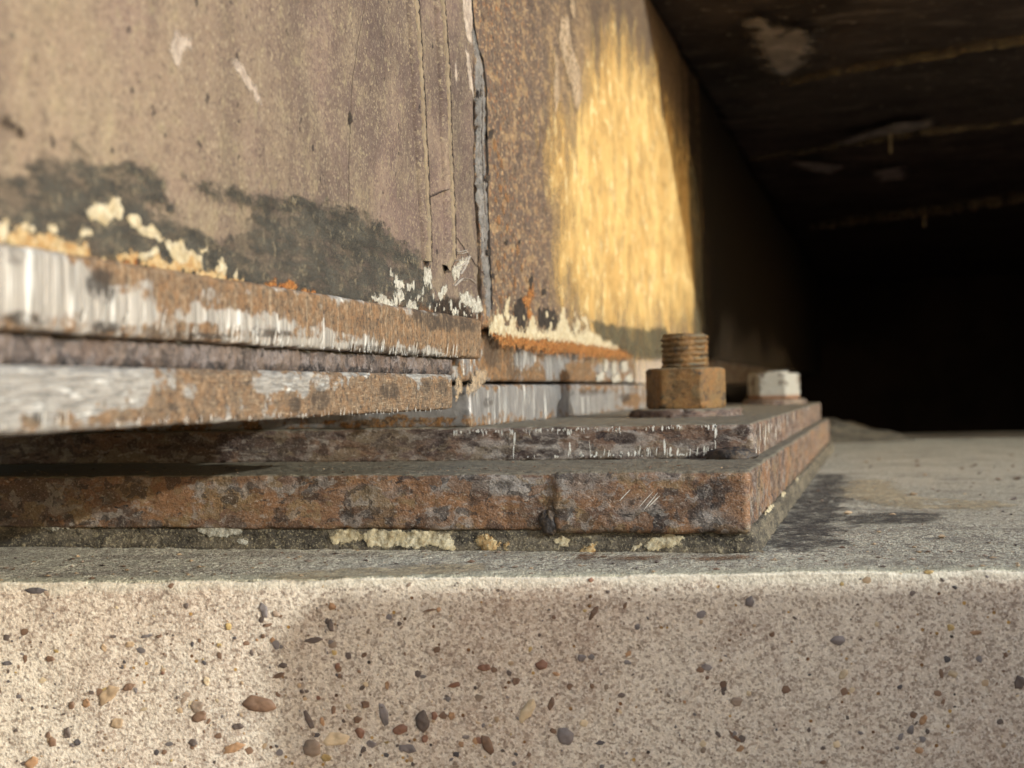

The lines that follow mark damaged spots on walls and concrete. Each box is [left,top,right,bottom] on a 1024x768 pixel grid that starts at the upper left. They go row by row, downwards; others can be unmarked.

water stain [0,22,704,384]
crack [457,0,495,319]
rust [493,138,534,320]
spalling [514,275,559,330]
rust [475,315,632,362]
rust [705,447,759,460]